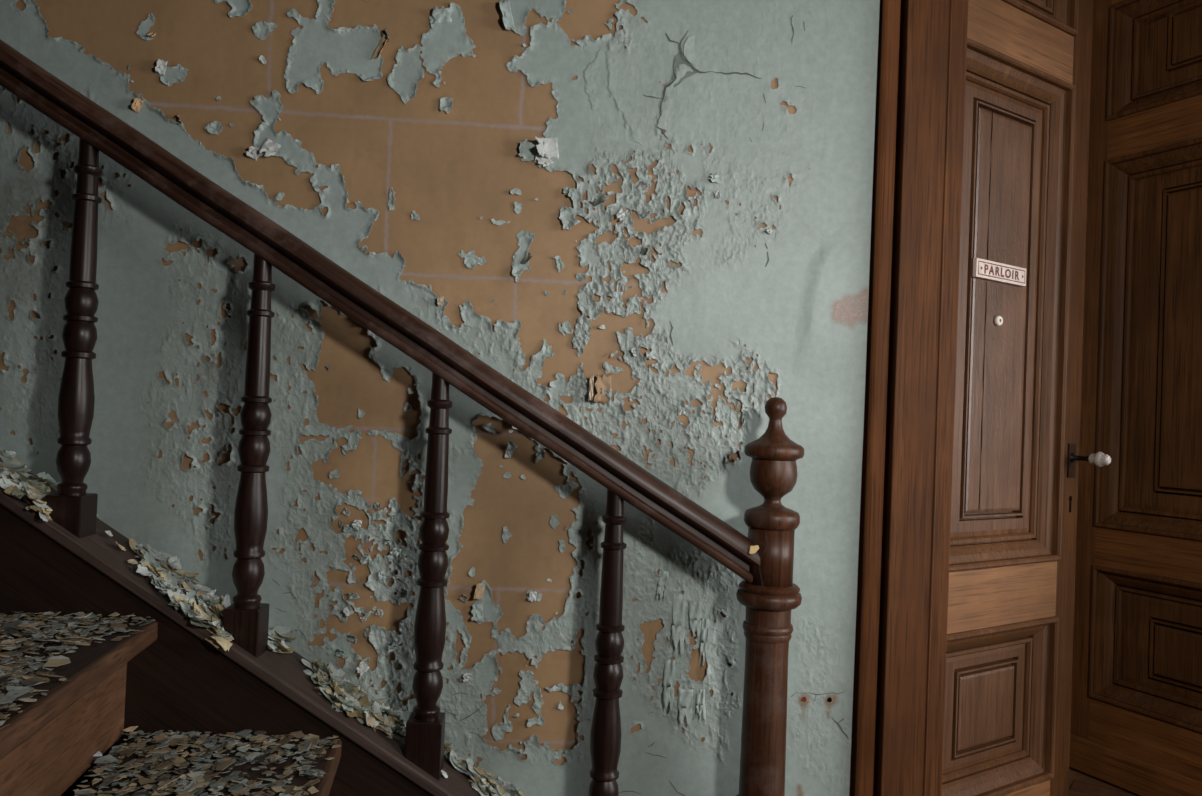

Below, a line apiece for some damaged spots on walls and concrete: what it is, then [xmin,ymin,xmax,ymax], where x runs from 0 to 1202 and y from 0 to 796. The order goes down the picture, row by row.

crack [644,30,766,142]
peeling [770,78,797,114]
peeling [0,124,74,264]
peeling [16,0,778,479]
peeling [0,352,29,383]
peeling [172,495,220,530]
peeling [270,300,425,707]
peeling [445,416,598,766]
peeling [630,569,726,734]